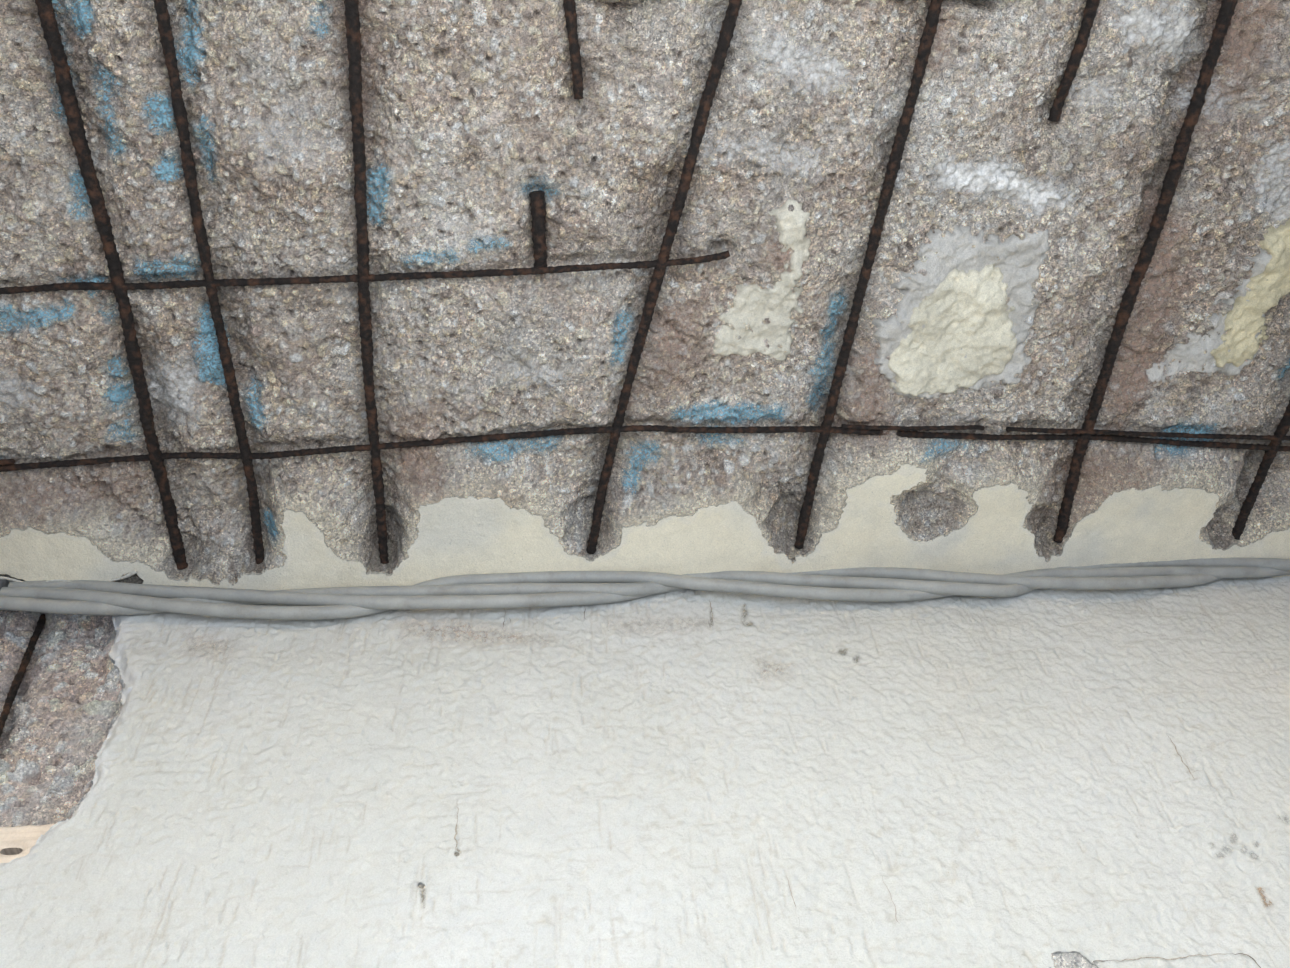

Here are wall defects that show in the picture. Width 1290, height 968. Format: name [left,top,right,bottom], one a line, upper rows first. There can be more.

rust [0,0,1290,570]
spalling [0,0,1290,585]
rust [0,614,46,737]
spalling [0,610,124,827]